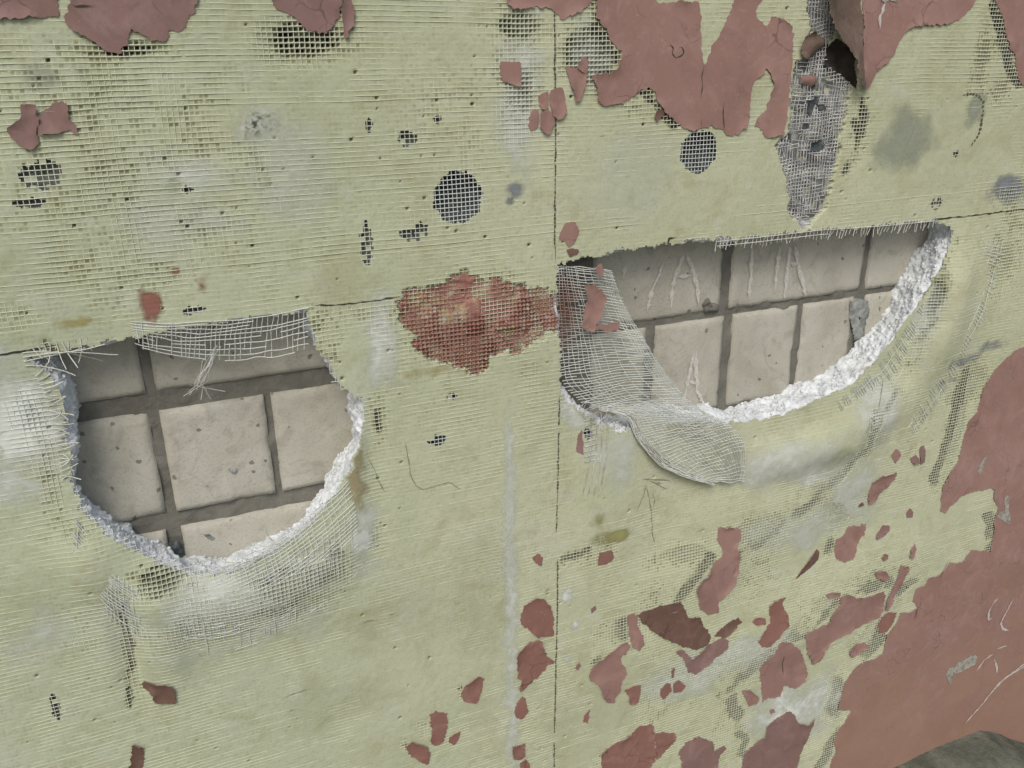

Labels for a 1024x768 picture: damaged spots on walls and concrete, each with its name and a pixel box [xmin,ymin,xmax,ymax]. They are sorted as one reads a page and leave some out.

peeling [0,0,198,54]
peeling [507,0,976,175]
peeling [7,101,78,209]
flaking render [433,170,483,224]
peeling [559,221,584,263]
spalling [638,197,953,424]
spalling [27,310,365,576]
peeling [660,347,1024,768]
peeling [514,598,557,719]
peeling [575,613,645,705]
peeling [512,744,530,768]
peeling [601,724,726,768]